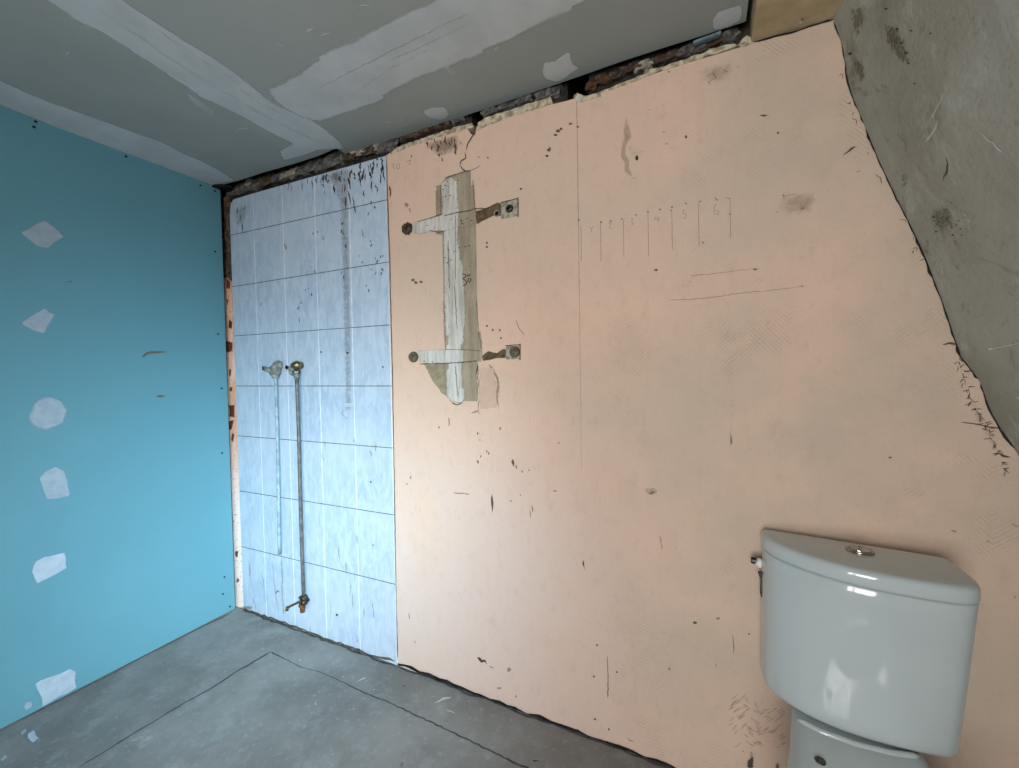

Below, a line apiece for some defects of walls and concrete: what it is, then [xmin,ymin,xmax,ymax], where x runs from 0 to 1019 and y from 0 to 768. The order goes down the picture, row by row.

flaking render [573,36,754,102]
flaking render [386,96,554,161]
water stain [288,158,385,214]
crack [417,133,496,233]